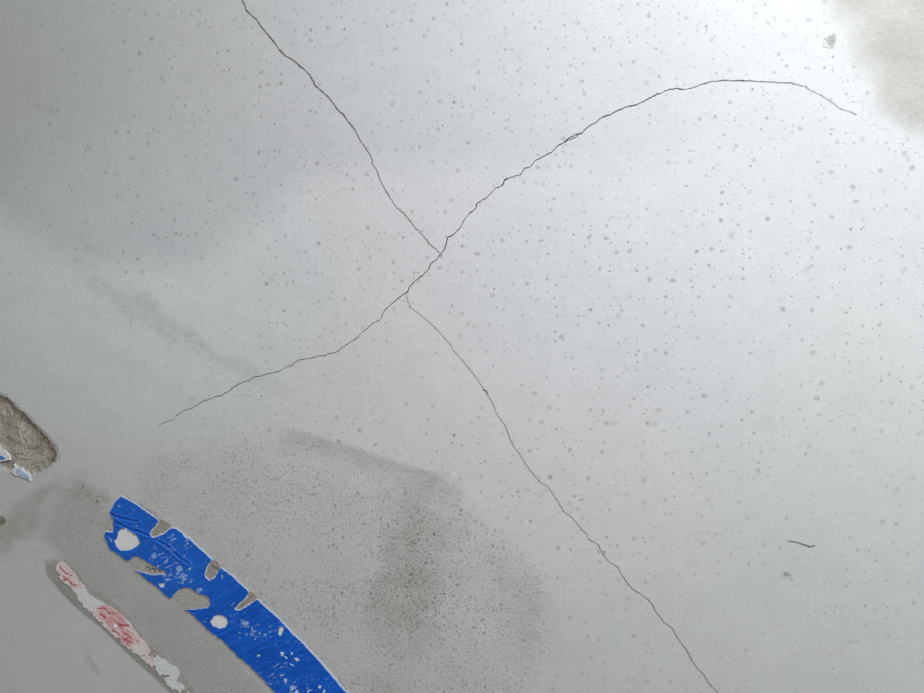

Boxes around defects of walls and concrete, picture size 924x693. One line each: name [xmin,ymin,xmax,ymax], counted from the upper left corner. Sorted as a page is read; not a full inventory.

damp [798,0,924,157]
crack [158,0,857,692]
peeling [56,562,189,693]
peeling [106,517,167,588]
peeling [151,520,171,536]
peeling [172,588,228,629]
peeling [205,560,221,580]
peeling [237,591,258,609]